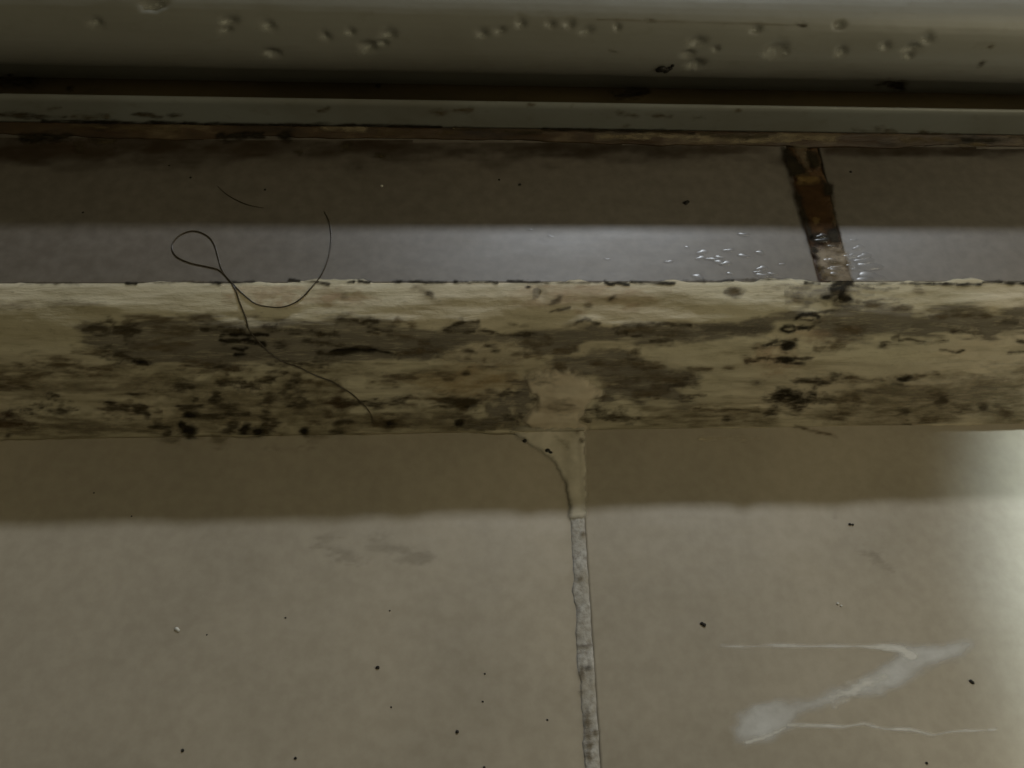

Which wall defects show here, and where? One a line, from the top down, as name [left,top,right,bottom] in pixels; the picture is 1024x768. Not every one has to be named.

leakage [75,262,1024,440]
leakage [738,644,965,744]